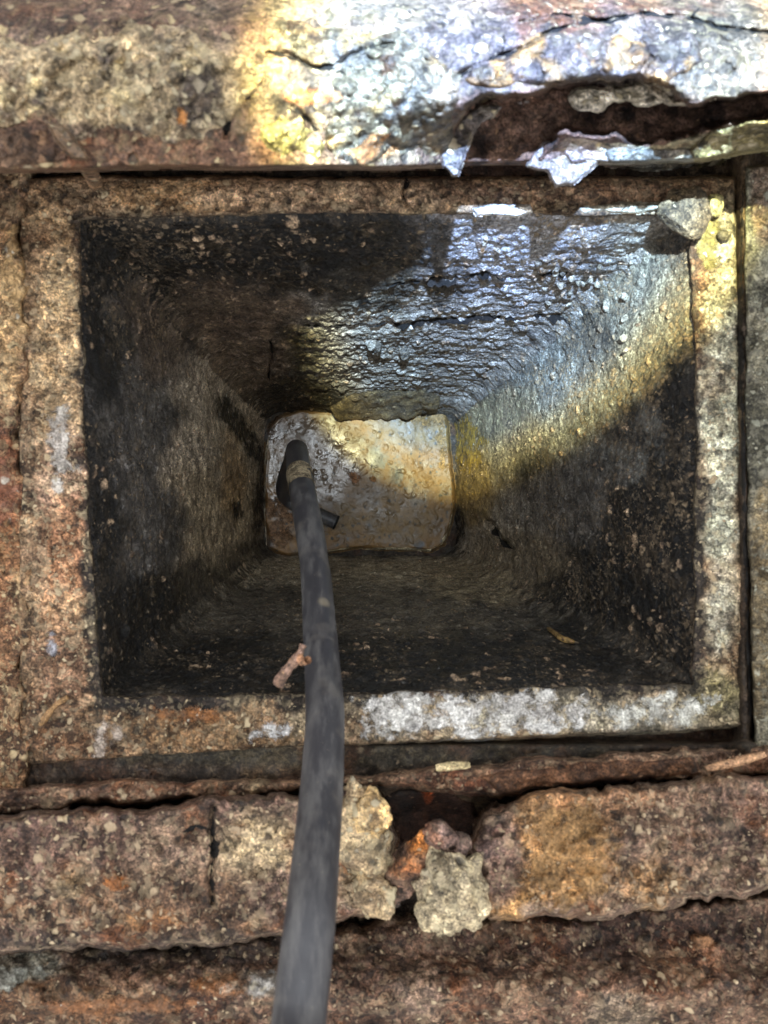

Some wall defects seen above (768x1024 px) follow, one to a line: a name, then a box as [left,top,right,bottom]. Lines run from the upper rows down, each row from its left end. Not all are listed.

crack [268,50,345,75]
crack [460,8,768,78]
crack [292,106,317,132]
spalling [442,80,768,188]
spalling [384,790,478,845]
crack [182,806,220,902]
rust [384,819,472,908]